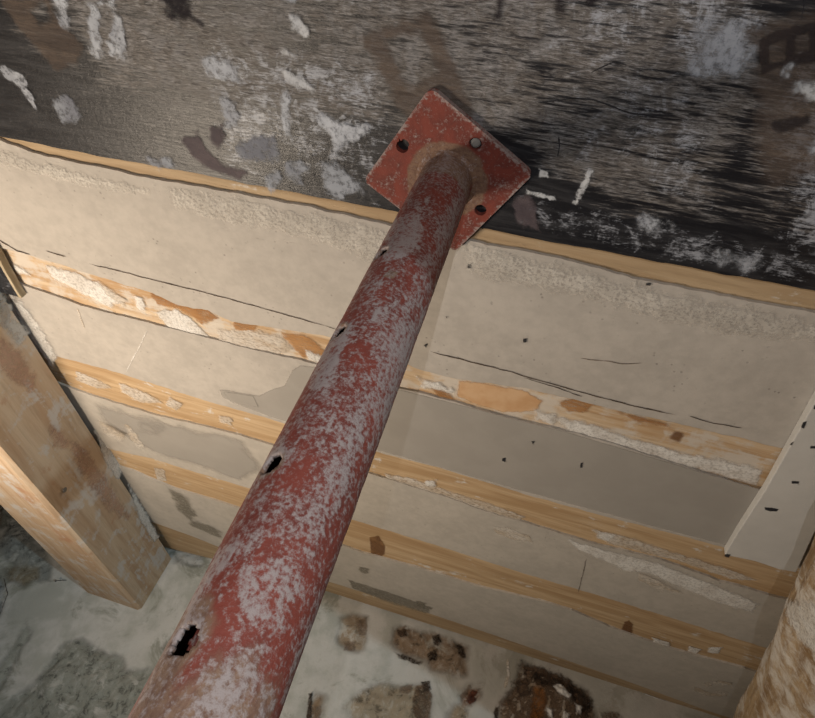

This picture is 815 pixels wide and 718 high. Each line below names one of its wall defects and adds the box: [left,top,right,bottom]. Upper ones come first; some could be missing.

damp [98,0,126,57]
damp [289,15,309,37]
damp [282,70,312,90]
damp [316,114,368,199]
damp [520,191,555,205]
peeling [151,293,218,324]
peeling [234,322,255,332]
peeling [283,334,324,363]
peeling [421,380,556,424]
peeling [561,399,593,412]
rust [306,693,320,718]
rust [401,681,432,718]